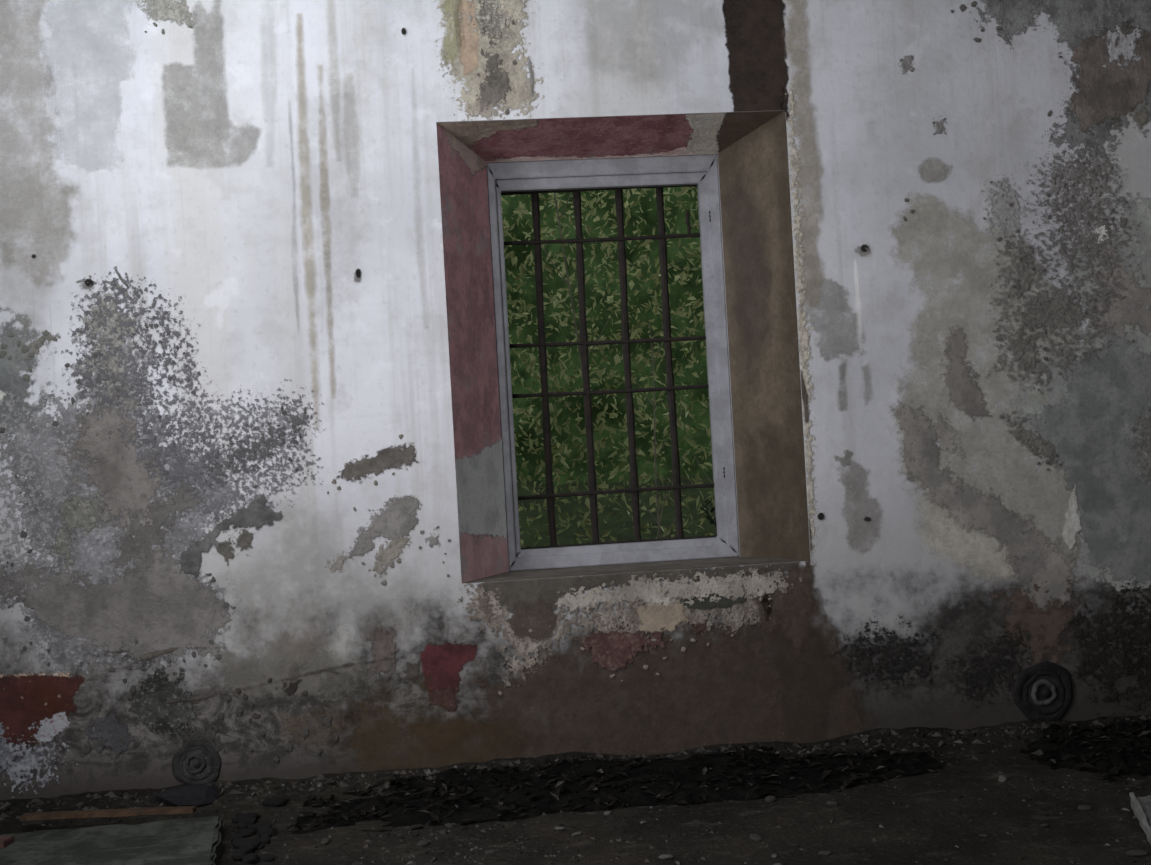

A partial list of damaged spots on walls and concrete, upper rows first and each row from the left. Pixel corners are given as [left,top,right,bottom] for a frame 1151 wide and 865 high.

flaking render [0,266,419,800]
leakage [221,633,374,705]
peeling [327,0,822,712]
leakage [919,159,952,182]
leakage [892,195,1084,611]
flaking render [827,0,1151,708]